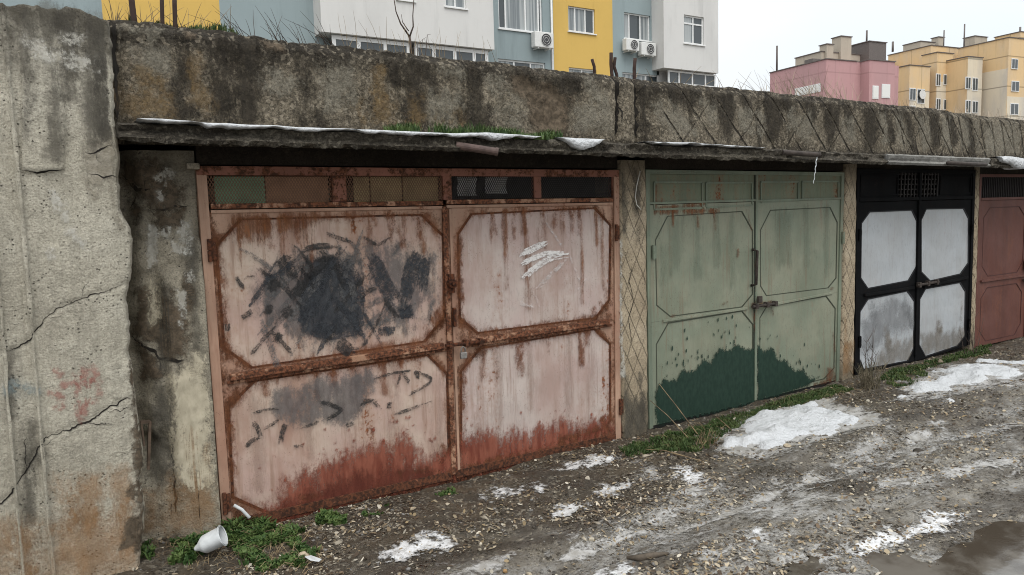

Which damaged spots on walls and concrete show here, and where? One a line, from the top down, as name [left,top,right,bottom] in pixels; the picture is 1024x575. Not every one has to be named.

crack [612,77,647,138]
water stain [635,82,976,156]
crack [10,283,124,351]
crack [132,336,187,375]
rust [210,205,615,452]
crack [0,398,130,504]
water stain [151,386,173,481]
rust [231,493,267,518]